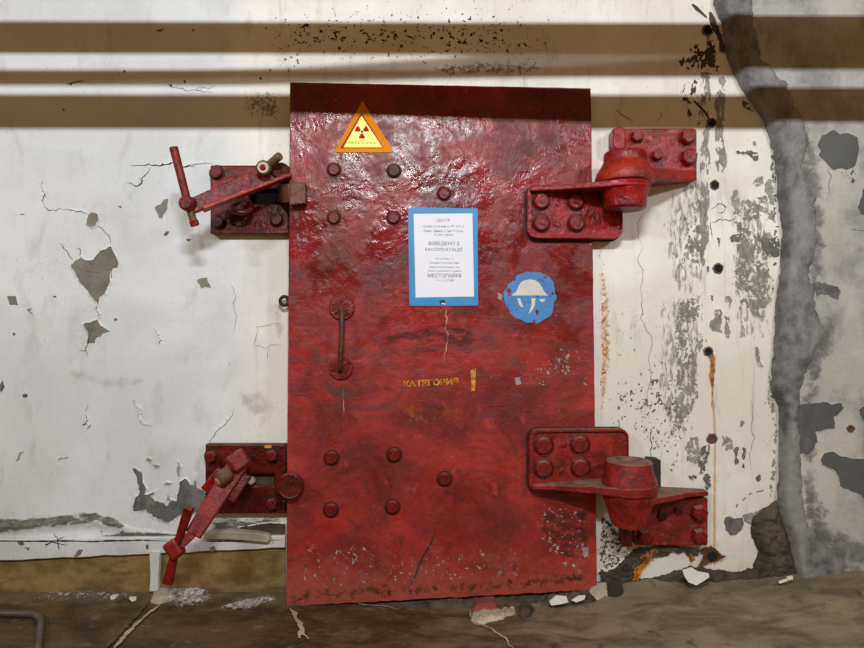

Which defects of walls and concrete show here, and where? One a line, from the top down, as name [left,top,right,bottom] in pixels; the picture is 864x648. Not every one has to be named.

crack [38,180,111,243]
peeling [69,243,121,346]
crack [127,159,212,187]
peeling [660,4,781,497]
peeling [816,129,864,217]
damp [809,326,833,379]
peeling [130,456,206,525]
rust [634,556,655,581]
spalling [597,545,726,585]
rust [708,355,716,546]
peeling [795,401,864,499]
damp [805,480,864,570]